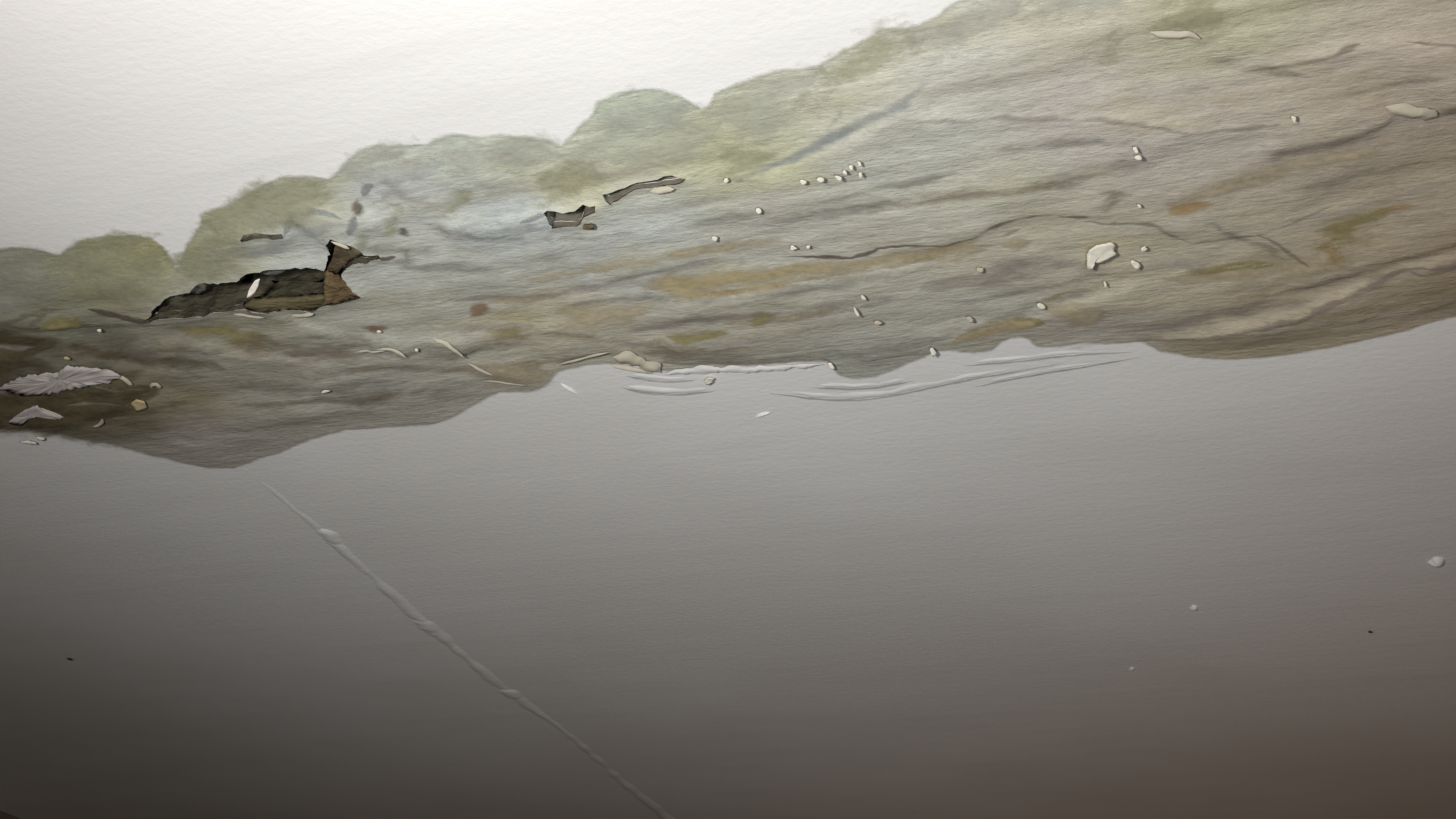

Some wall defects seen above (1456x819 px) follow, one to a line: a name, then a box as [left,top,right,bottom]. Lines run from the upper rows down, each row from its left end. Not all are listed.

spalling [88,184,395,332]
spalling [520,175,685,230]
damp [0,0,1456,468]
peeling [0,332,204,444]